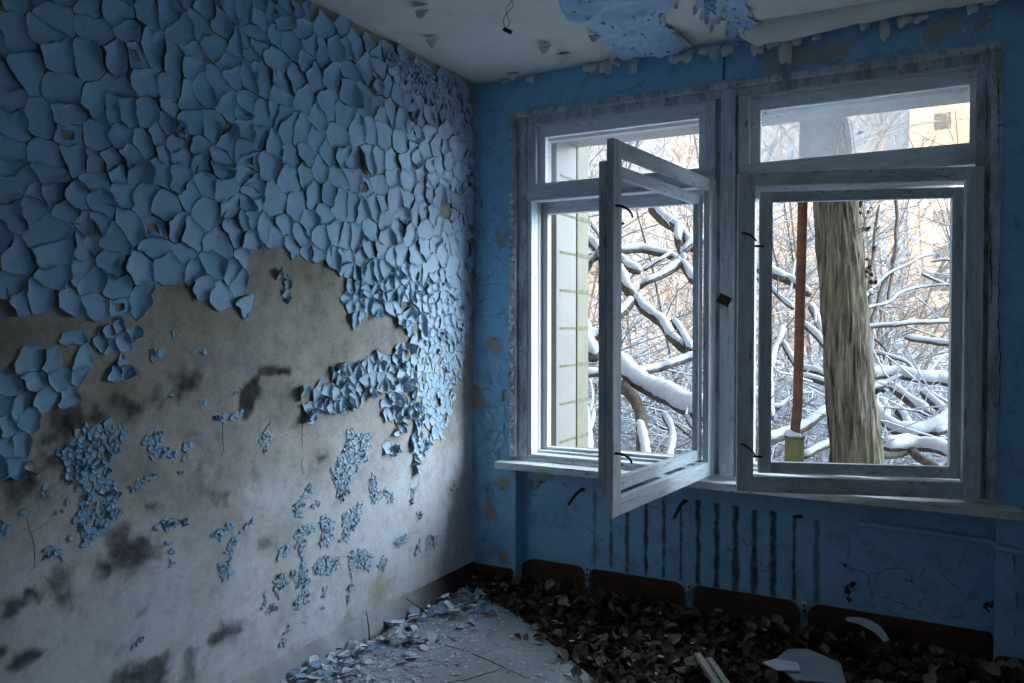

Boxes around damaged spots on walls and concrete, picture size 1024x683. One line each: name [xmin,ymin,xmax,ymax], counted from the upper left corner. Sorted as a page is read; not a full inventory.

peeling [559,0,1000,76]
peeling [0,0,479,648]
leakage [178,372,199,396]
leakage [240,367,291,419]
leakage [59,410,104,430]
leakage [100,529,150,575]
leakage [732,505,777,596]
leakage [5,589,36,617]
leakage [209,628,240,645]
leakage [0,648,41,670]
leakage [120,657,165,683]